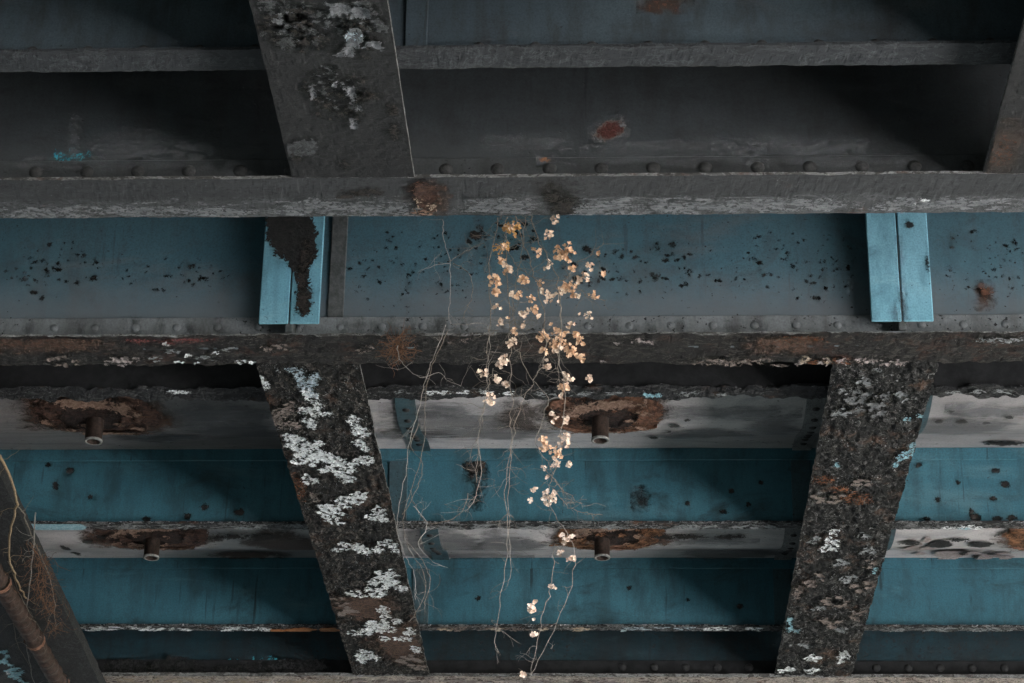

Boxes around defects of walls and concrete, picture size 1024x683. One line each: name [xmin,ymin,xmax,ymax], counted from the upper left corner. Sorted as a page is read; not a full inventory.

rust [408,181,453,216]
rust [974,281,994,312]
peeling [31,502,209,556]